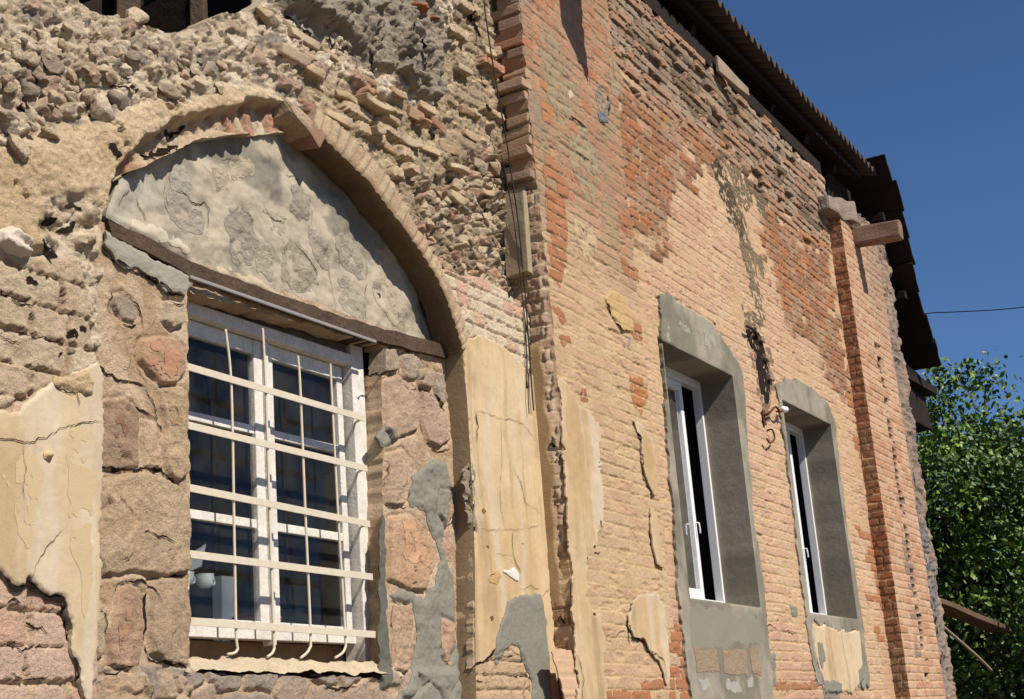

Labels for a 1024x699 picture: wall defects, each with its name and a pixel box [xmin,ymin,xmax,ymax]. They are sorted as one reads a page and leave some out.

spalling [271,26,488,176]
spalling [164,161,205,235]
spalling [224,183,409,334]
flaking render [542,153,569,288]
flaking render [595,85,729,220]
flaking render [551,305,571,347]
peeling [52,370,95,395]
crack [0,386,103,498]
spalling [441,463,486,561]
peeling [489,567,519,584]
spalling [440,618,457,665]
spalling [607,623,762,699]